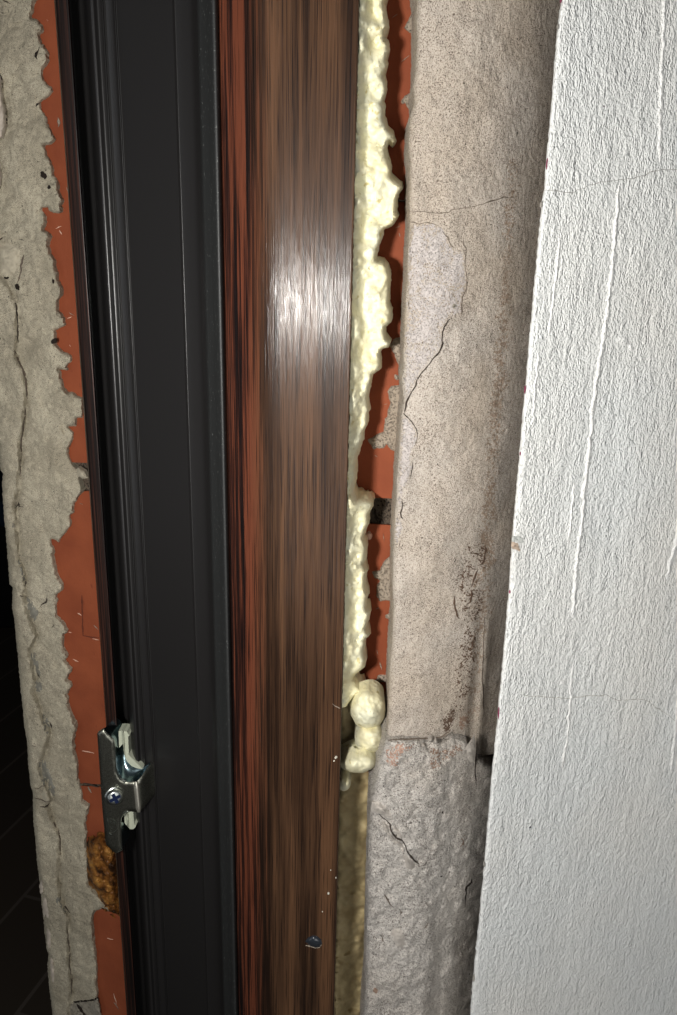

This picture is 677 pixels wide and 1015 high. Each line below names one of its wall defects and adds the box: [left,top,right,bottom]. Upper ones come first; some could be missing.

crack [545,169,677,193]
peeling [403,224,466,399]
crack [404,196,517,479]
crack [379,814,427,866]